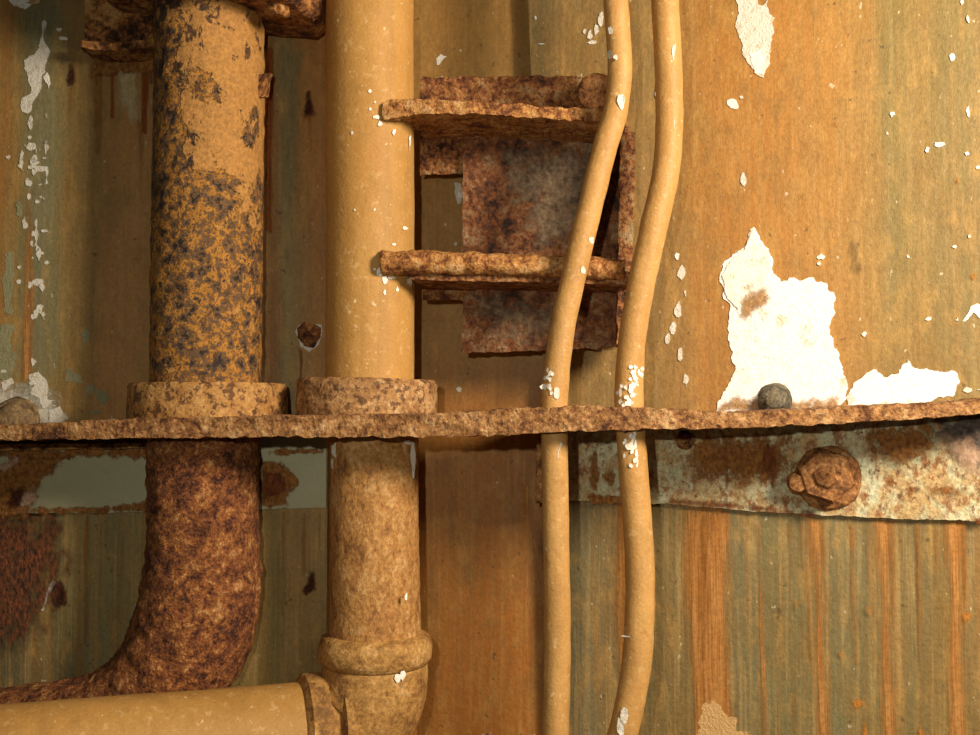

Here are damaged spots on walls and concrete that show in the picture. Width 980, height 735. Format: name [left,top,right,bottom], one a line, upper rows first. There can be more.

peeling [735,0,775,78]
peeling [6,20,68,265]
peeling [0,251,45,400]
peeling [29,358,63,422]
corrosion [683,432,792,488]
peeling [717,227,980,412]
corrosion [865,423,937,464]
corrosion [670,499,737,735]
peeling [697,700,748,735]
corrosion [749,504,828,735]
corrosion [876,520,895,735]
corrosion [945,517,980,735]